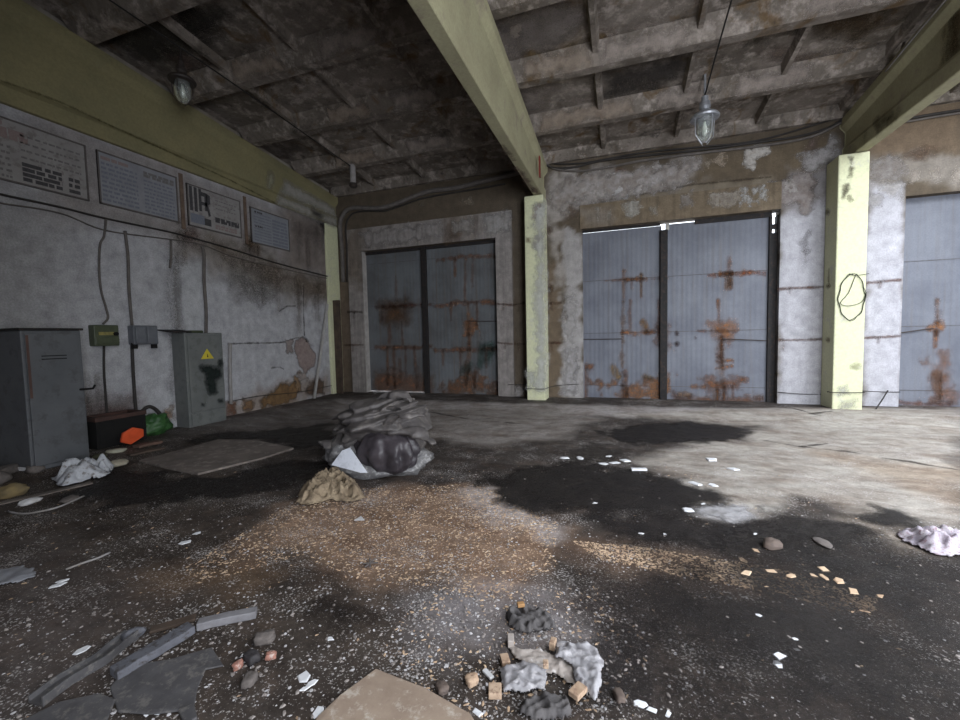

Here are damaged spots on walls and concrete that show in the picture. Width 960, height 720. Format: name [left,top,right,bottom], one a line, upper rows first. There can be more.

corrosion [709,261,766,290]
spalling [226,337,325,416]
corrosion [375,299,525,395]
corrosion [584,318,764,401]
corrosion [899,299,955,406]